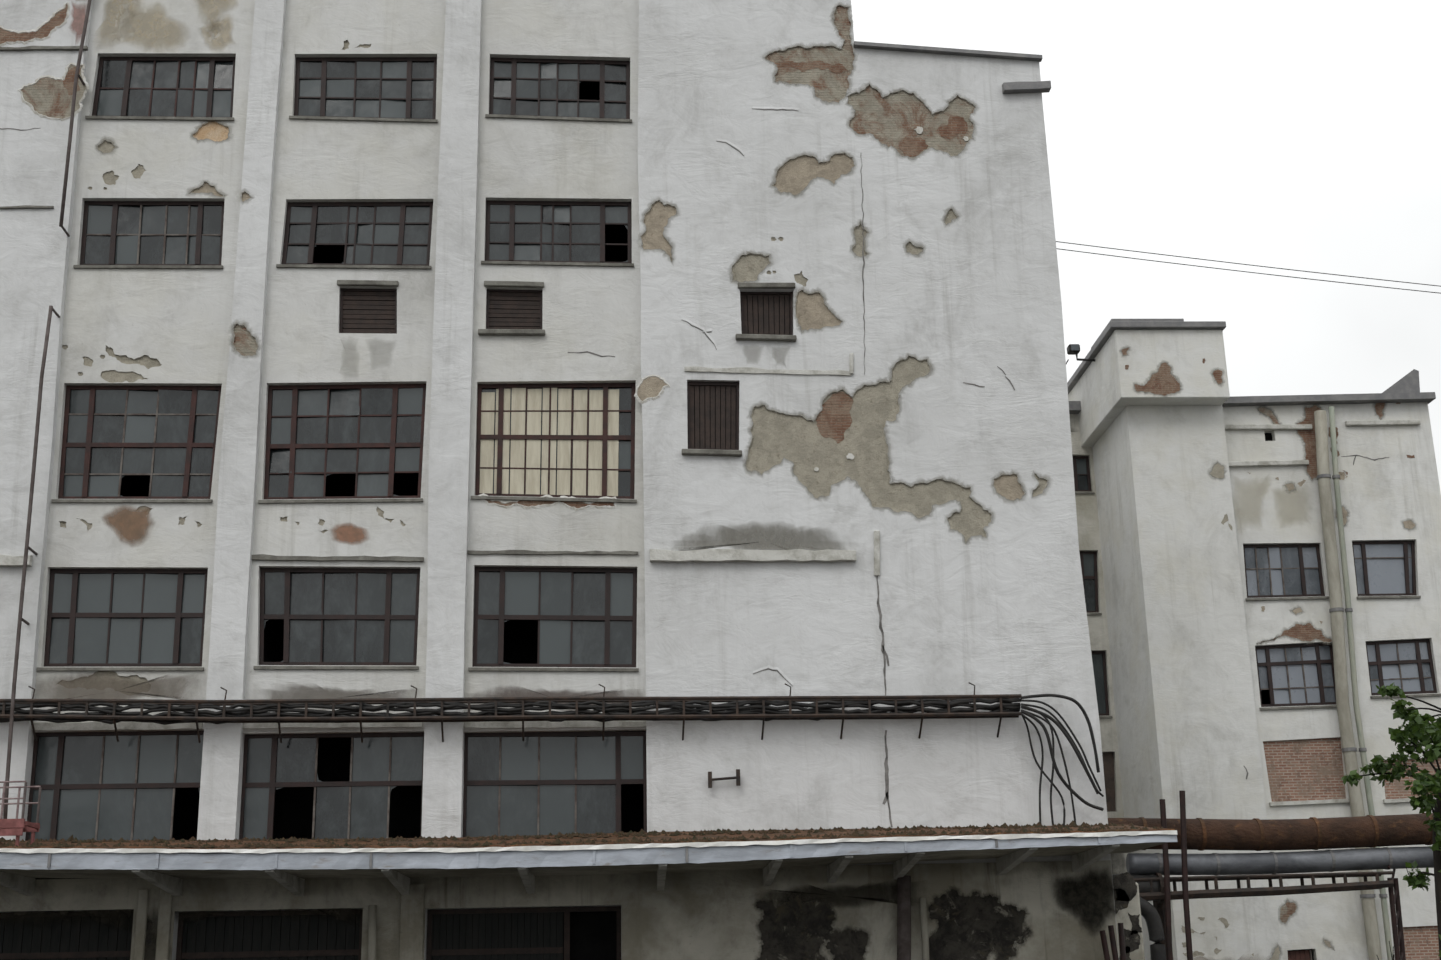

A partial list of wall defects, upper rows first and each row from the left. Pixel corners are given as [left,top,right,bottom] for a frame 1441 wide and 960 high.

flaking render [0,2,70,47]
spalling [18,63,89,121]
spalling [764,4,976,159]
spalling [772,152,855,197]
spalling [640,200,678,262]
flaking render [1121,347,1181,397]
spalling [744,355,993,544]
spalling [992,472,1049,502]
crack [876,576,889,695]
crack [882,730,893,827]
water stain [770,883,897,906]